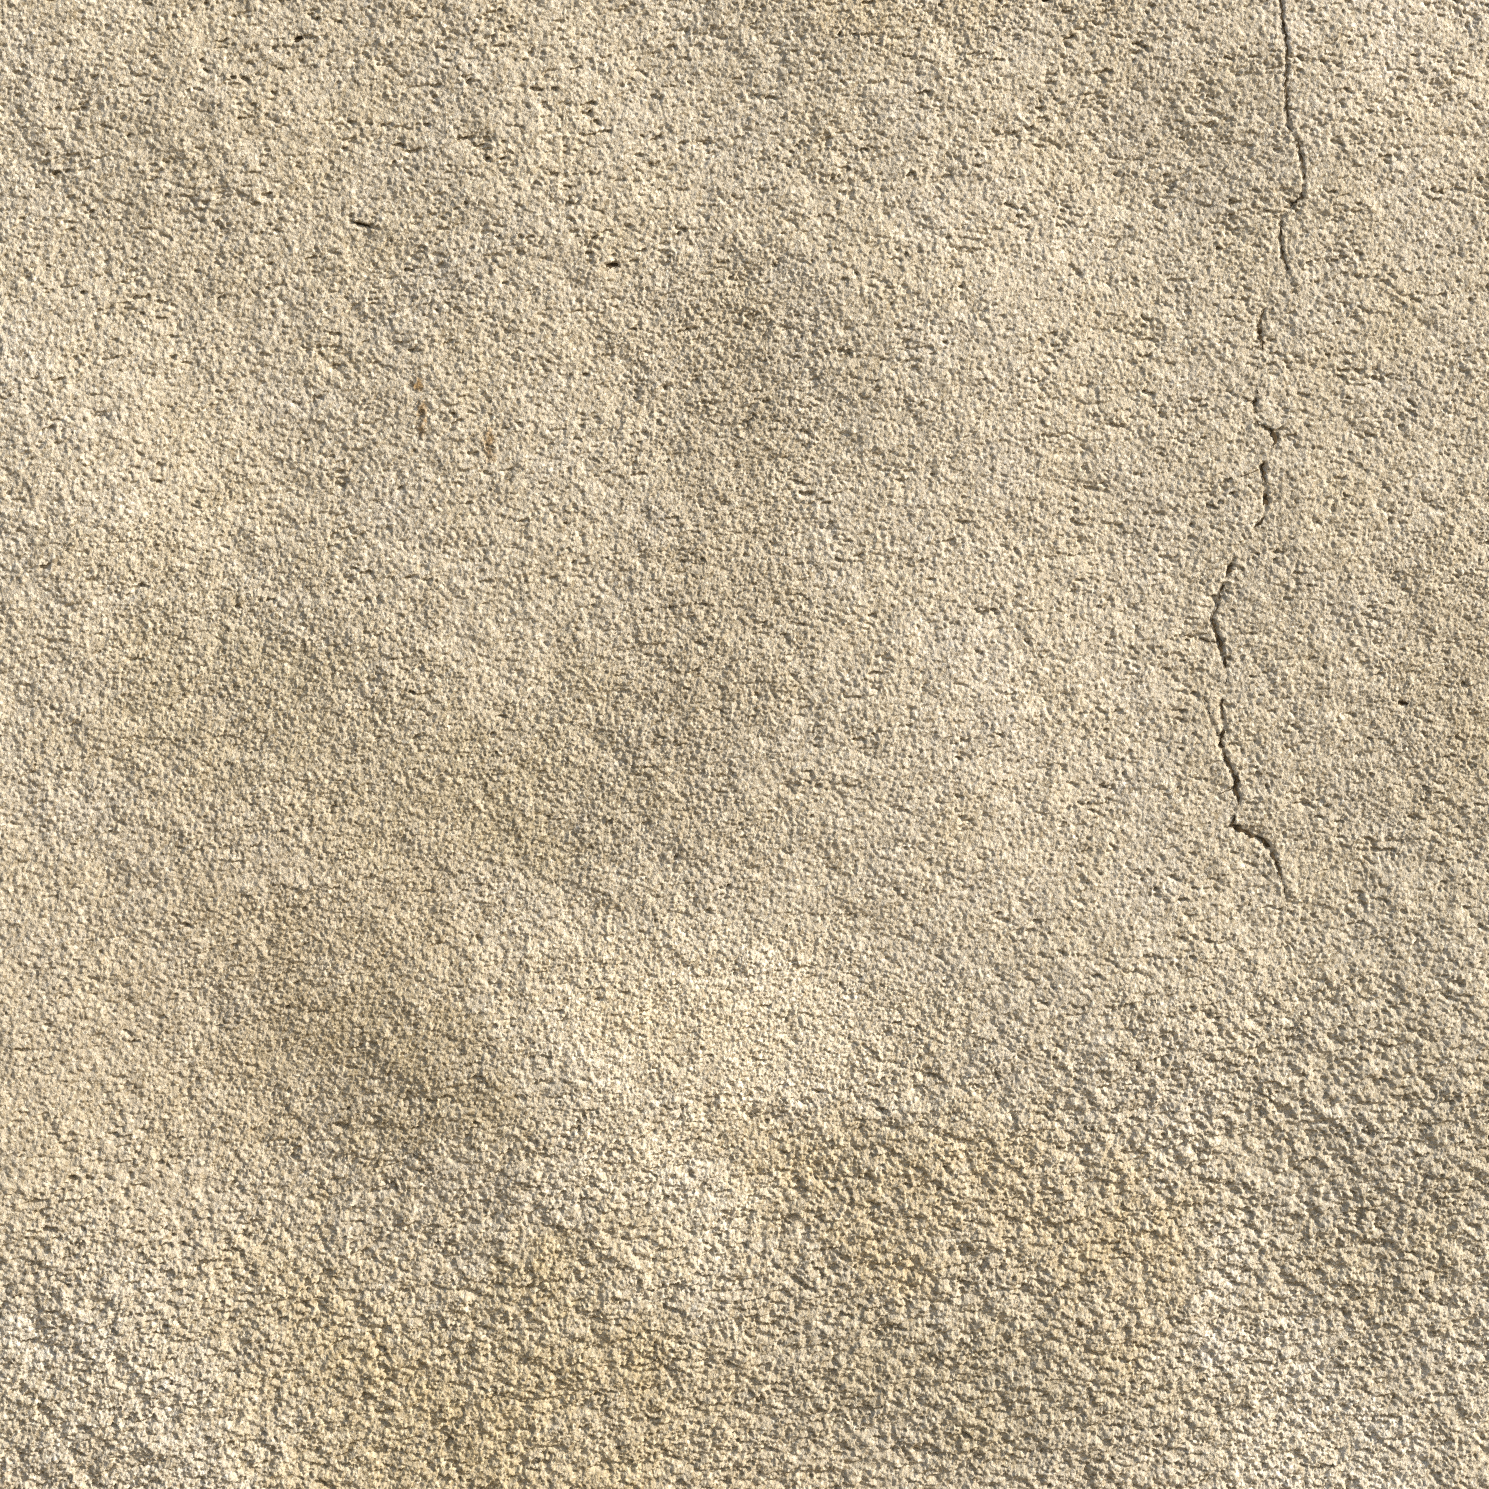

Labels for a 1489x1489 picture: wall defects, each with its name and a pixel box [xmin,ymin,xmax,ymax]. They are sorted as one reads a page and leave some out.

crack [1264,0,1305,270]
crack [1241,308,1277,528]
crack [1183,560,1288,907]